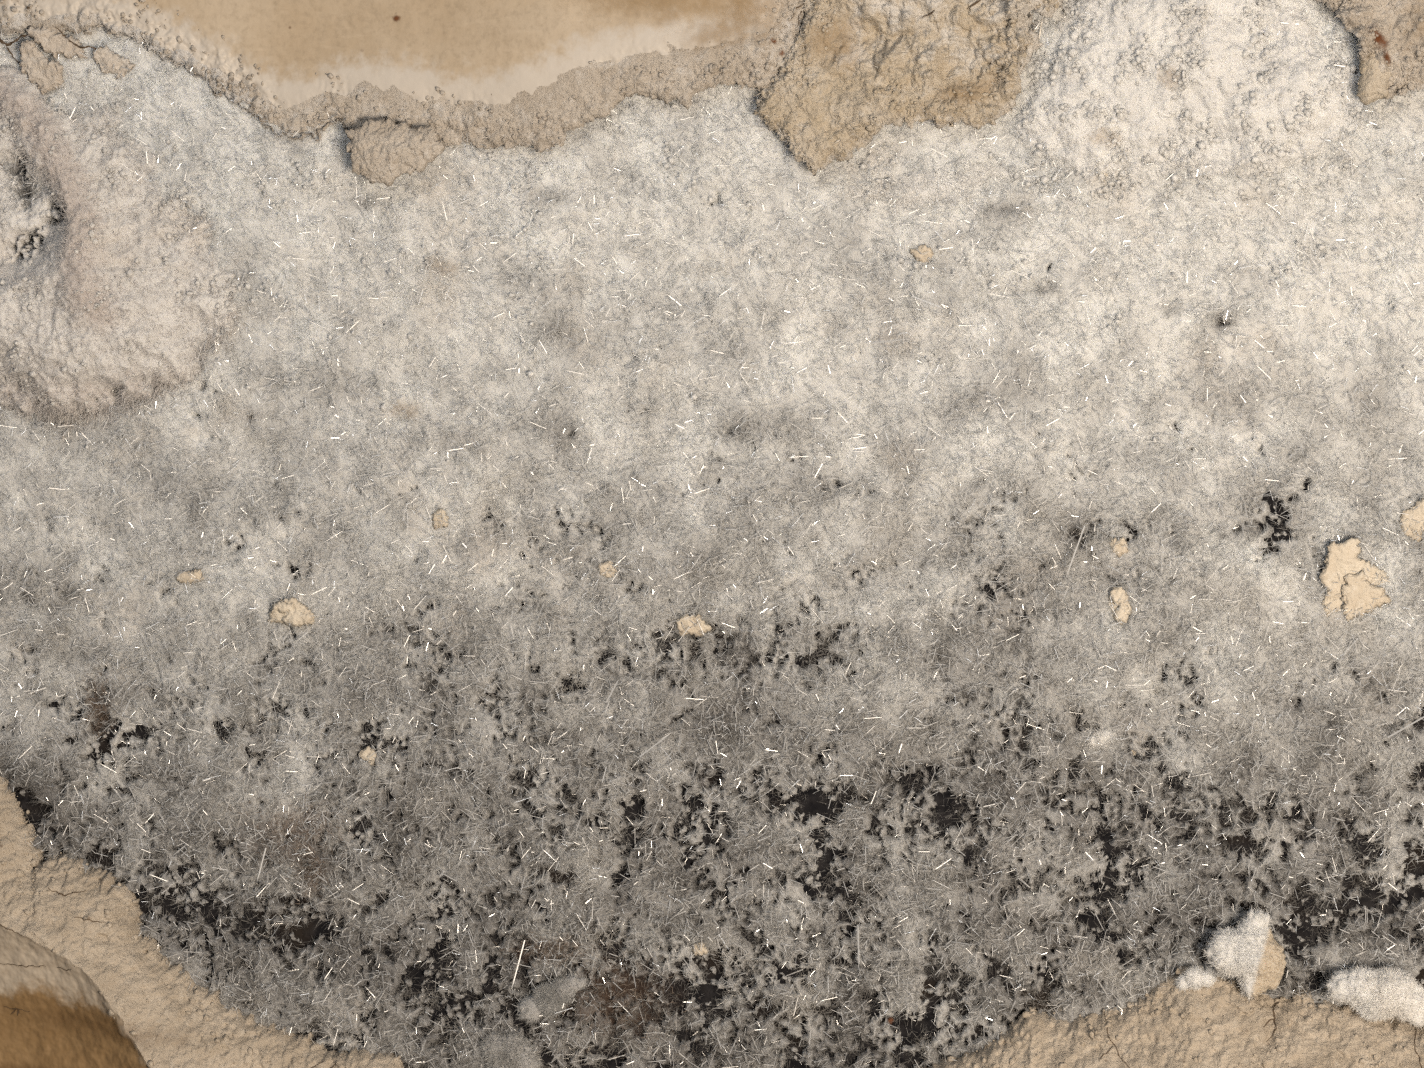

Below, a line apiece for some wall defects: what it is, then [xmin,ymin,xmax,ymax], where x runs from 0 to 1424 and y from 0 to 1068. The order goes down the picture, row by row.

damp [0,31,37,86]
peeling [0,0,1063,176]
spalling [1313,0,1424,99]
damp [0,154,65,261]
spalling [1399,498,1424,542]
spalling [267,597,315,627]
spalling [675,614,712,637]
spalling [1108,587,1132,625]
spalling [1319,537,1391,622]
spalling [358,746,378,766]
spalling [0,776,404,1068]
spalling [918,966,1424,1068]